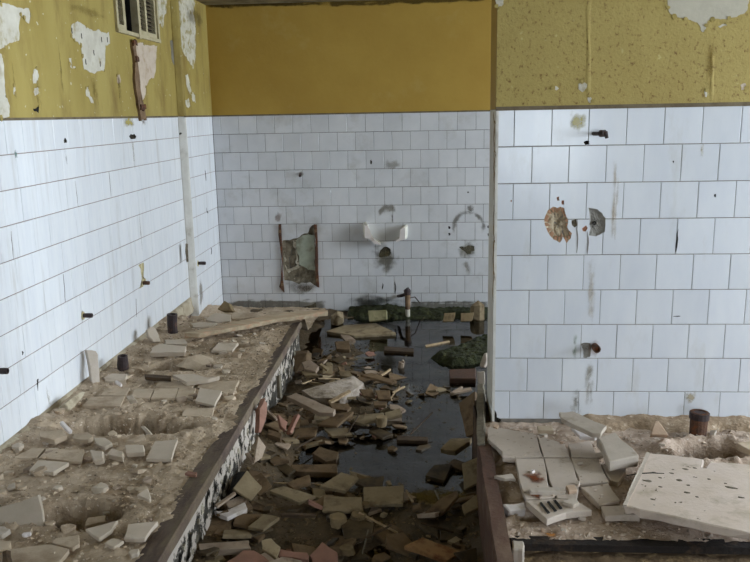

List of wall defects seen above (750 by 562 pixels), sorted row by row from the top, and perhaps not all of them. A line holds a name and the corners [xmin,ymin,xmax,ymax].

peeling [666,0,749,33]
peeling [0,2,32,121]
peeling [69,22,110,74]
peeling [136,42,157,101]
peeling [158,0,196,109]
spalling [544,197,606,243]
spalling [282,225,316,286]